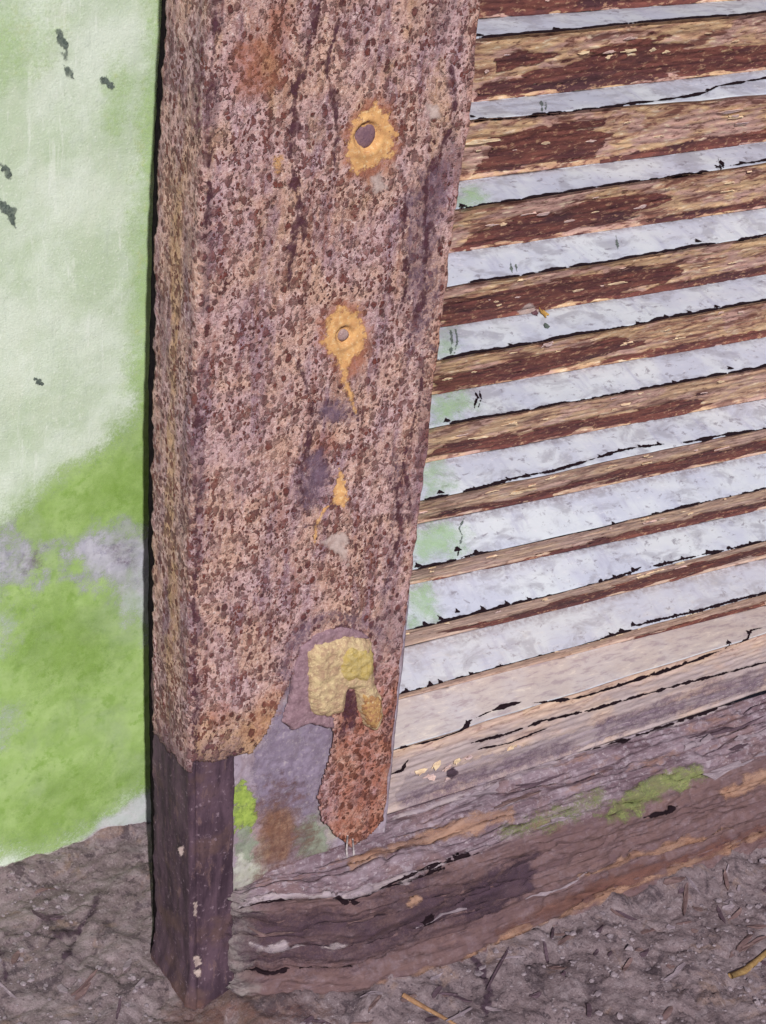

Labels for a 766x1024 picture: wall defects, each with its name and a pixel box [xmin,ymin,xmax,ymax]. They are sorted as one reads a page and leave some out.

peeling [474,31,766,101]
peeling [465,109,766,174]
peeling [450,187,766,251]
peeling [440,260,766,328]
peeling [432,328,766,394]
corrosion [150,0,514,869]
damp [0,521,149,624]
crack [400,592,766,694]
crack [391,628,766,775]
damp [97,792,151,831]
crack [644,805,678,818]
crack [240,852,482,909]